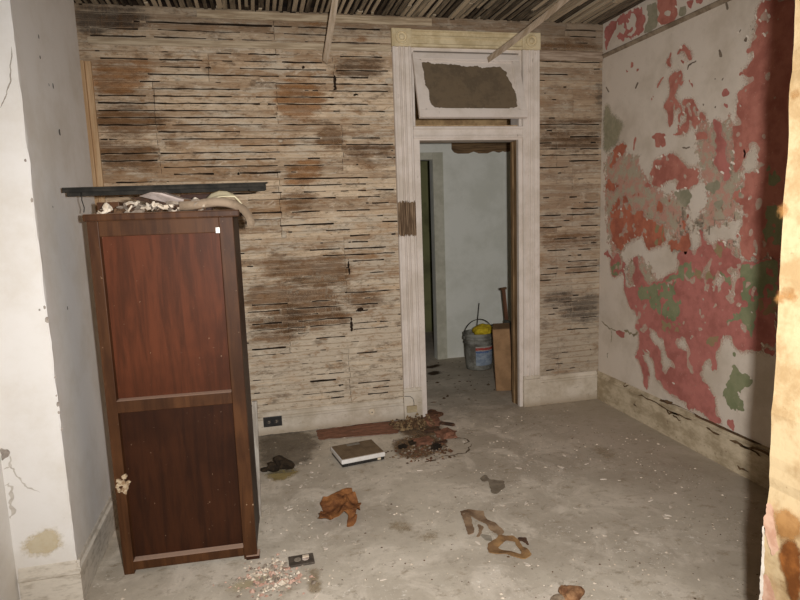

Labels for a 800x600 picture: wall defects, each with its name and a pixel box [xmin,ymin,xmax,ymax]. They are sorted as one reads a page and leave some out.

water stain [337,59,383,76]
water stain [275,79,326,122]
flaking render [414,80,511,125]
water stain [98,105,165,167]
water stain [317,129,391,156]
peeling [603,0,795,457]
water stain [244,254,379,341]
crack [5,455,39,519]
water stain [26,531,58,553]